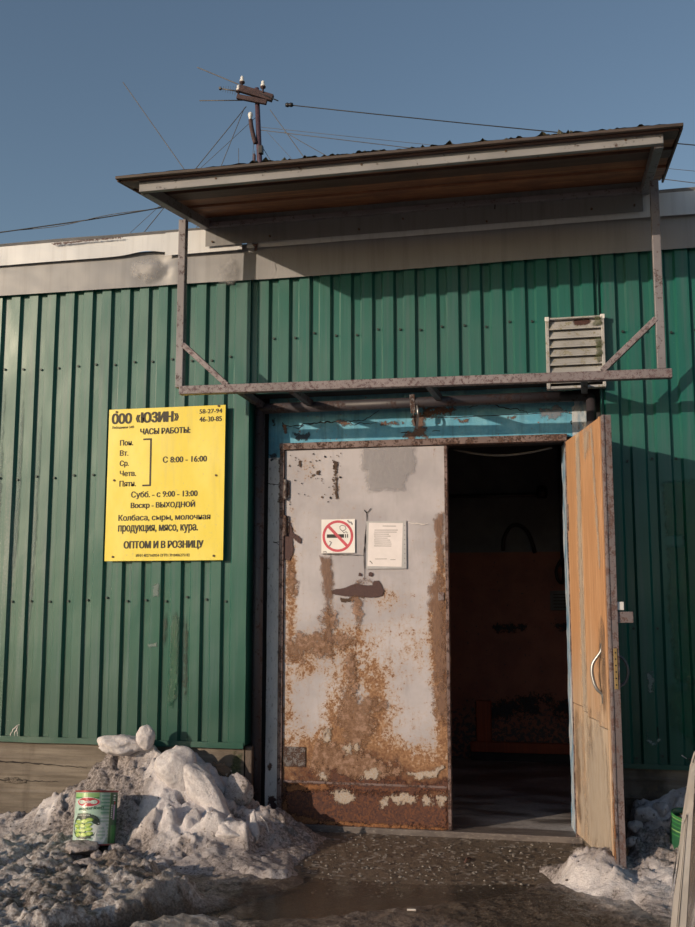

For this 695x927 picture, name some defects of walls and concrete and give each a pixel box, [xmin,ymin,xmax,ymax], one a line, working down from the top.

rust [401,412,439,439]
rust [284,522,302,598]
rust [282,608,452,831]
rust [427,513,447,726]
damp [663,480,695,744]